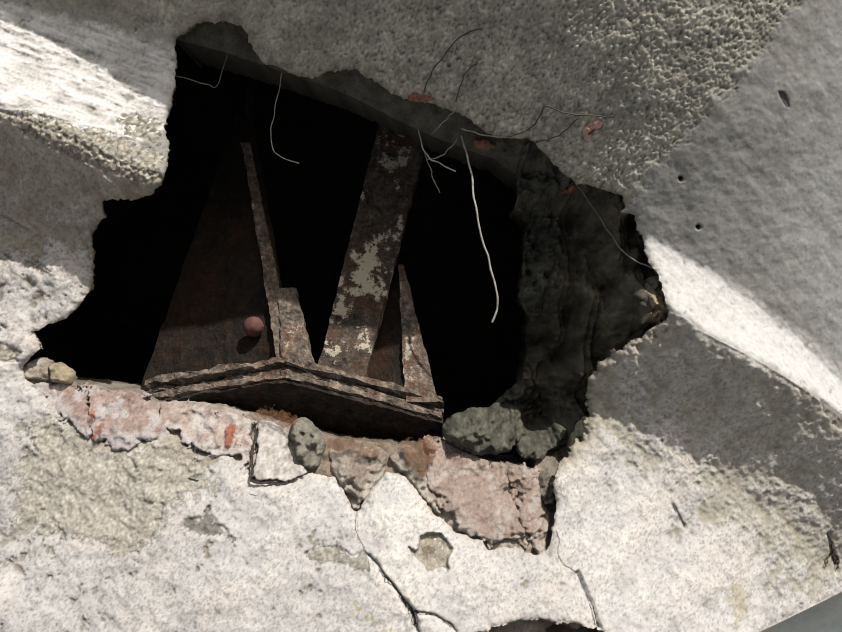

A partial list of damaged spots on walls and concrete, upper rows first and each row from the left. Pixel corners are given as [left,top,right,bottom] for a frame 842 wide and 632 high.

spalling [0,20,669,555]
corrosion [144,357,444,421]
corrosion [224,424,242,447]
corrosion [255,410,297,428]
crack [249,422,304,486]
peeling [306,545,370,571]
crack [355,511,456,632]
spalling [410,532,453,572]
peeling [486,619,604,632]